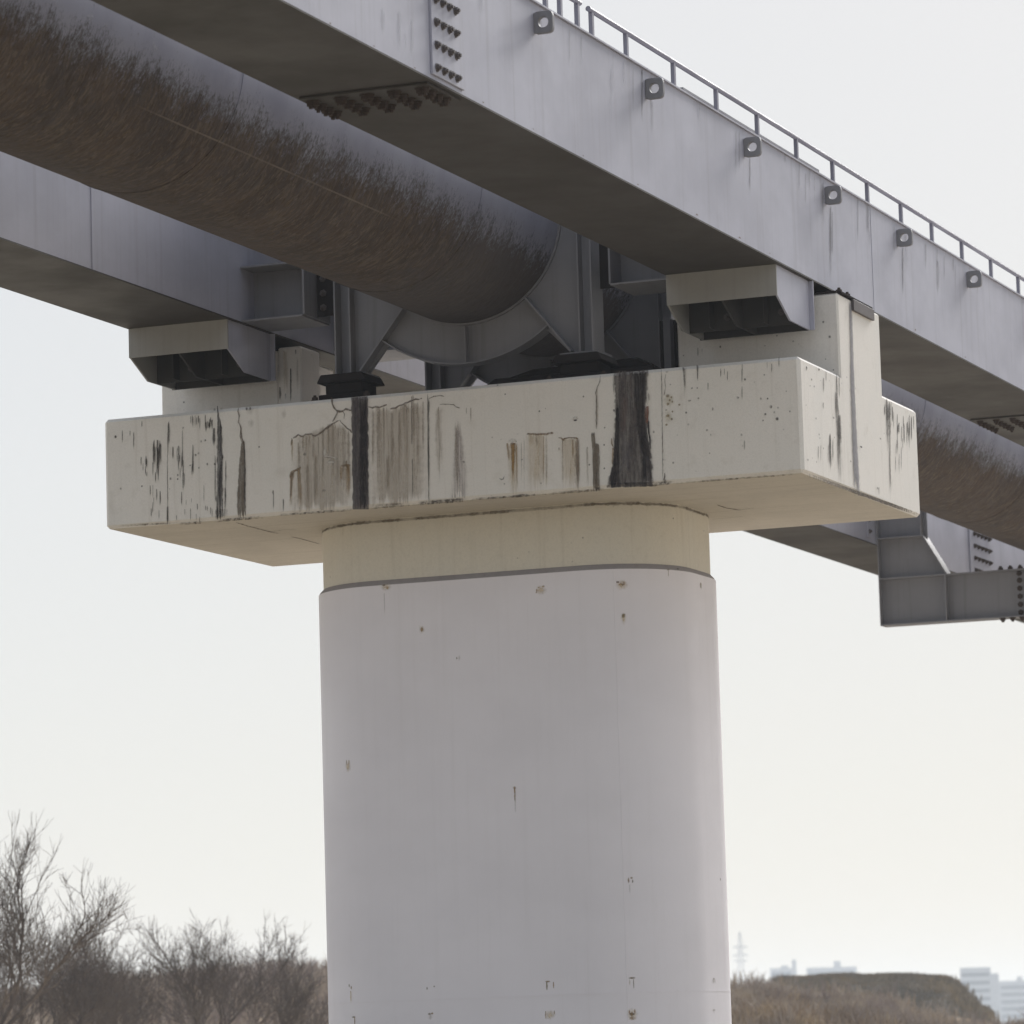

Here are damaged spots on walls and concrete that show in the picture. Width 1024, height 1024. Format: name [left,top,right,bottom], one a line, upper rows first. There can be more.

water stain [142,406,251,525]
water stain [273,396,416,532]
crack [291,395,459,497]
water stain [415,494,535,520]
corrosion [507,439,517,477]
corrosion [527,432,579,480]
water stain [562,370,708,517]
water stain [884,400,914,485]